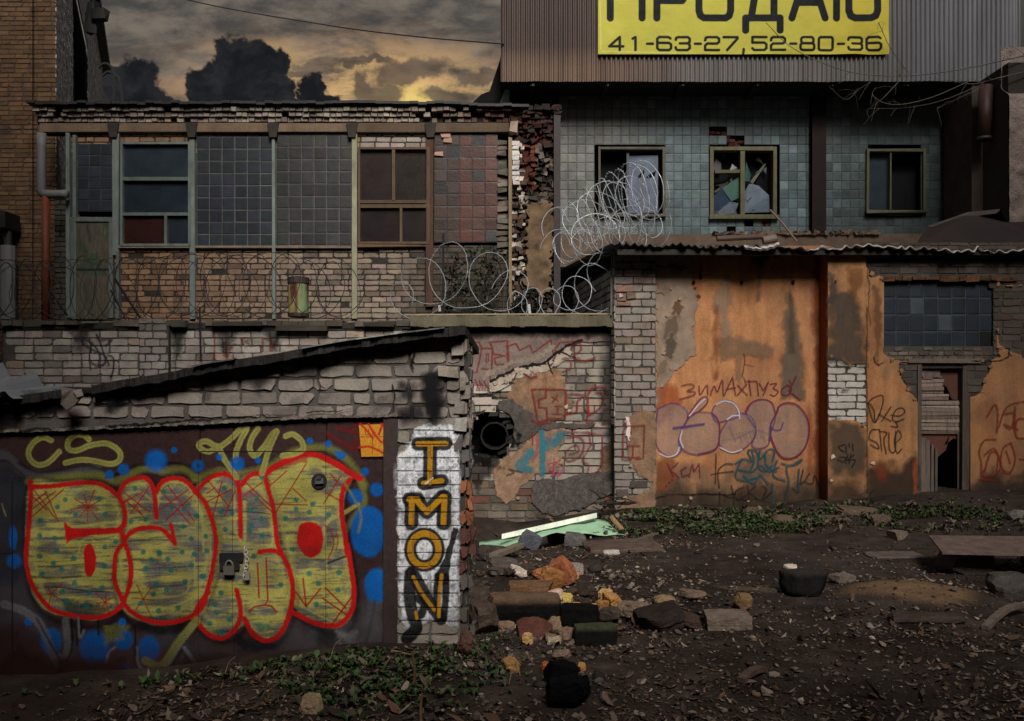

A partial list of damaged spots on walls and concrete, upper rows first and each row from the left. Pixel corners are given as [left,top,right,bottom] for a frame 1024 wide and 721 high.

crack [472,339,583,399]
flaking render [437,256,701,516]
water stain [714,278,805,399]
flaking render [861,242,1024,401]